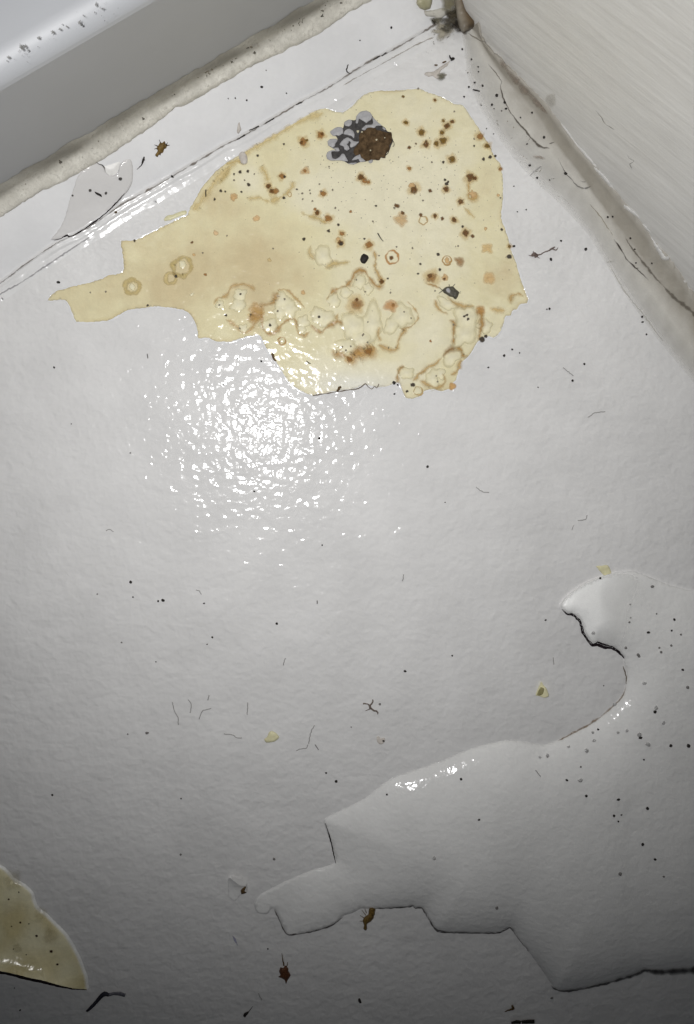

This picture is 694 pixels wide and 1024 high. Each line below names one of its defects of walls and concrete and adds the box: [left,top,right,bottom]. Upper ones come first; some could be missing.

leakage [47,87,530,400]
peeling [0,865,89,990]